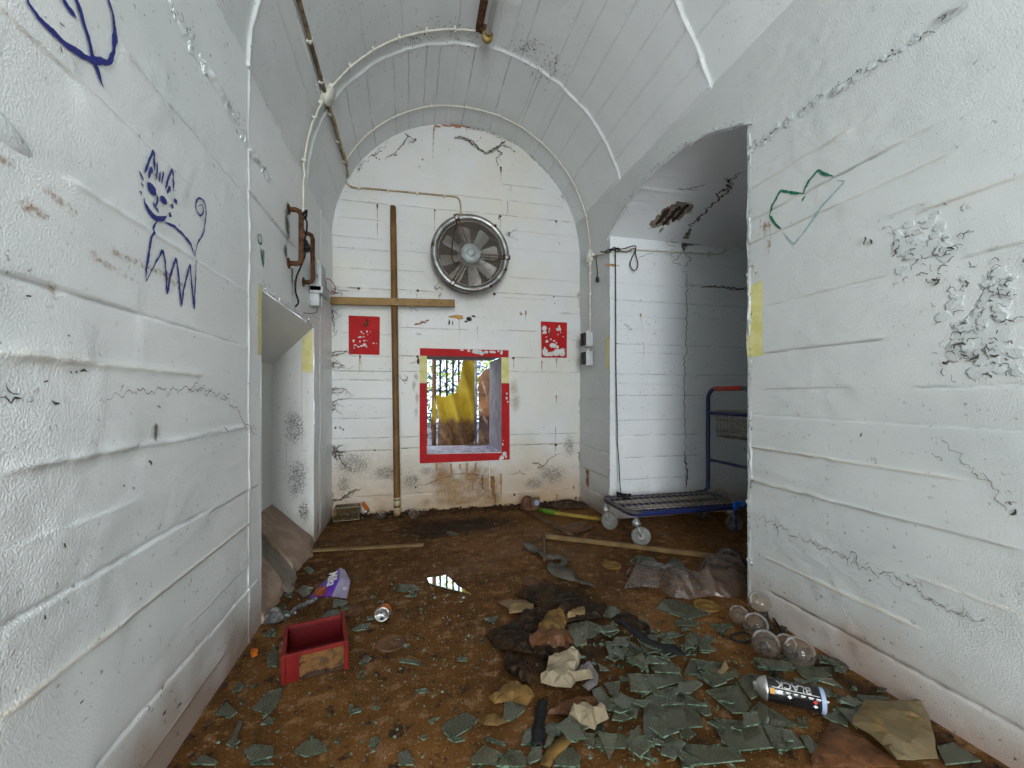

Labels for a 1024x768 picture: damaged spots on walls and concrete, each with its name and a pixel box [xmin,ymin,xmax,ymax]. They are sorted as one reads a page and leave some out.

spalling [647,201,694,233]
crack [638,173,746,491]
spalling [743,0,967,603]
peeling [882,203,1024,383]
crack [100,382,256,435]
mould [288,461,310,523]
leakage [407,462,502,505]
crack [939,437,1016,512]
crack [752,512,1004,633]